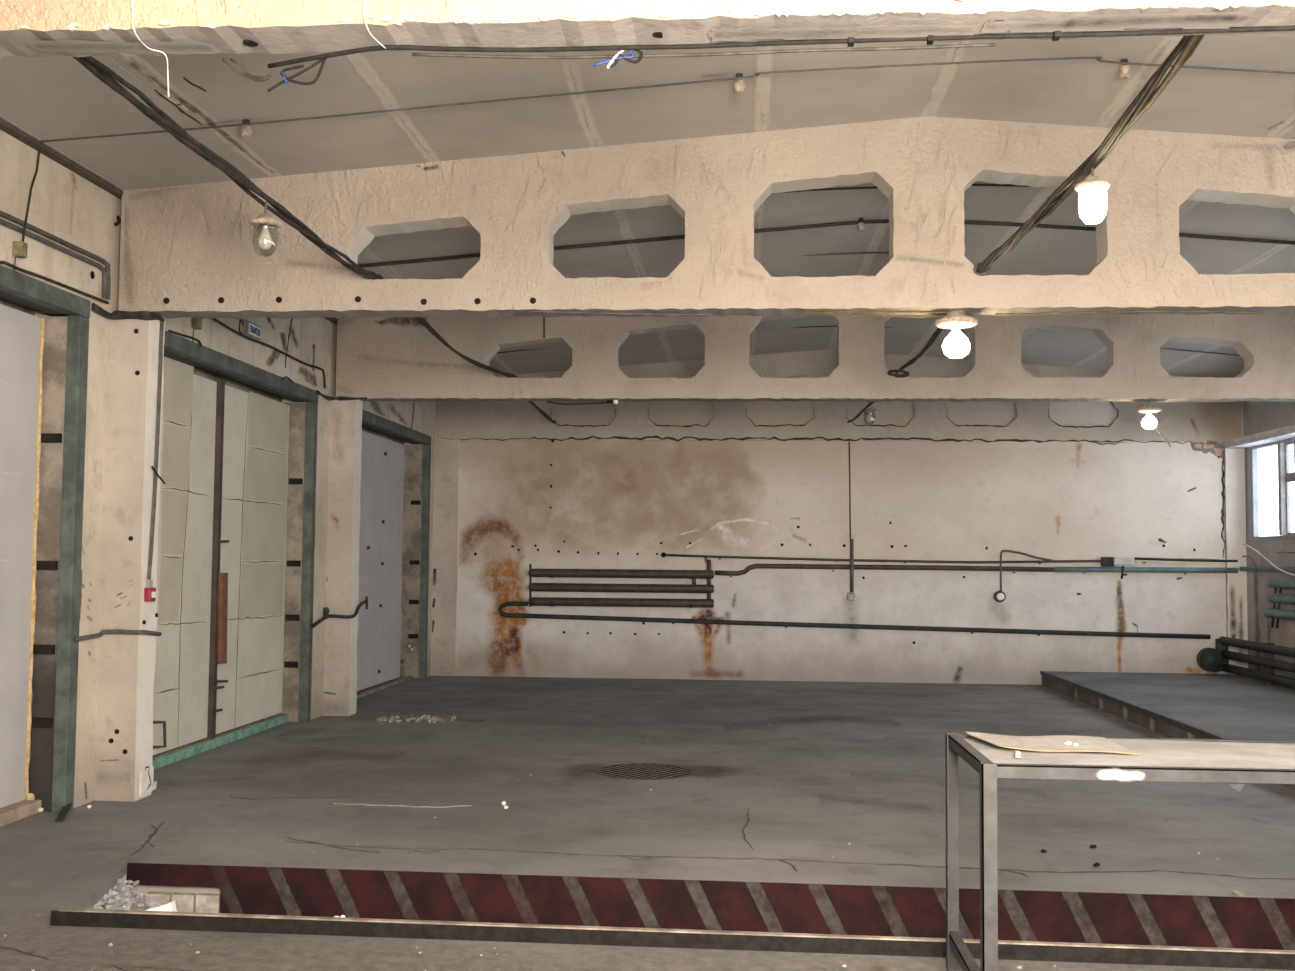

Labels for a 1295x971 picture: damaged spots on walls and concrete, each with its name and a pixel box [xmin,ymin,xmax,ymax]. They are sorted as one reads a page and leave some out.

water stain [528,471,559,497]
corrosion [457,512,546,677]
corrosion [687,607,747,679]
corrosion [1114,579,1128,672]